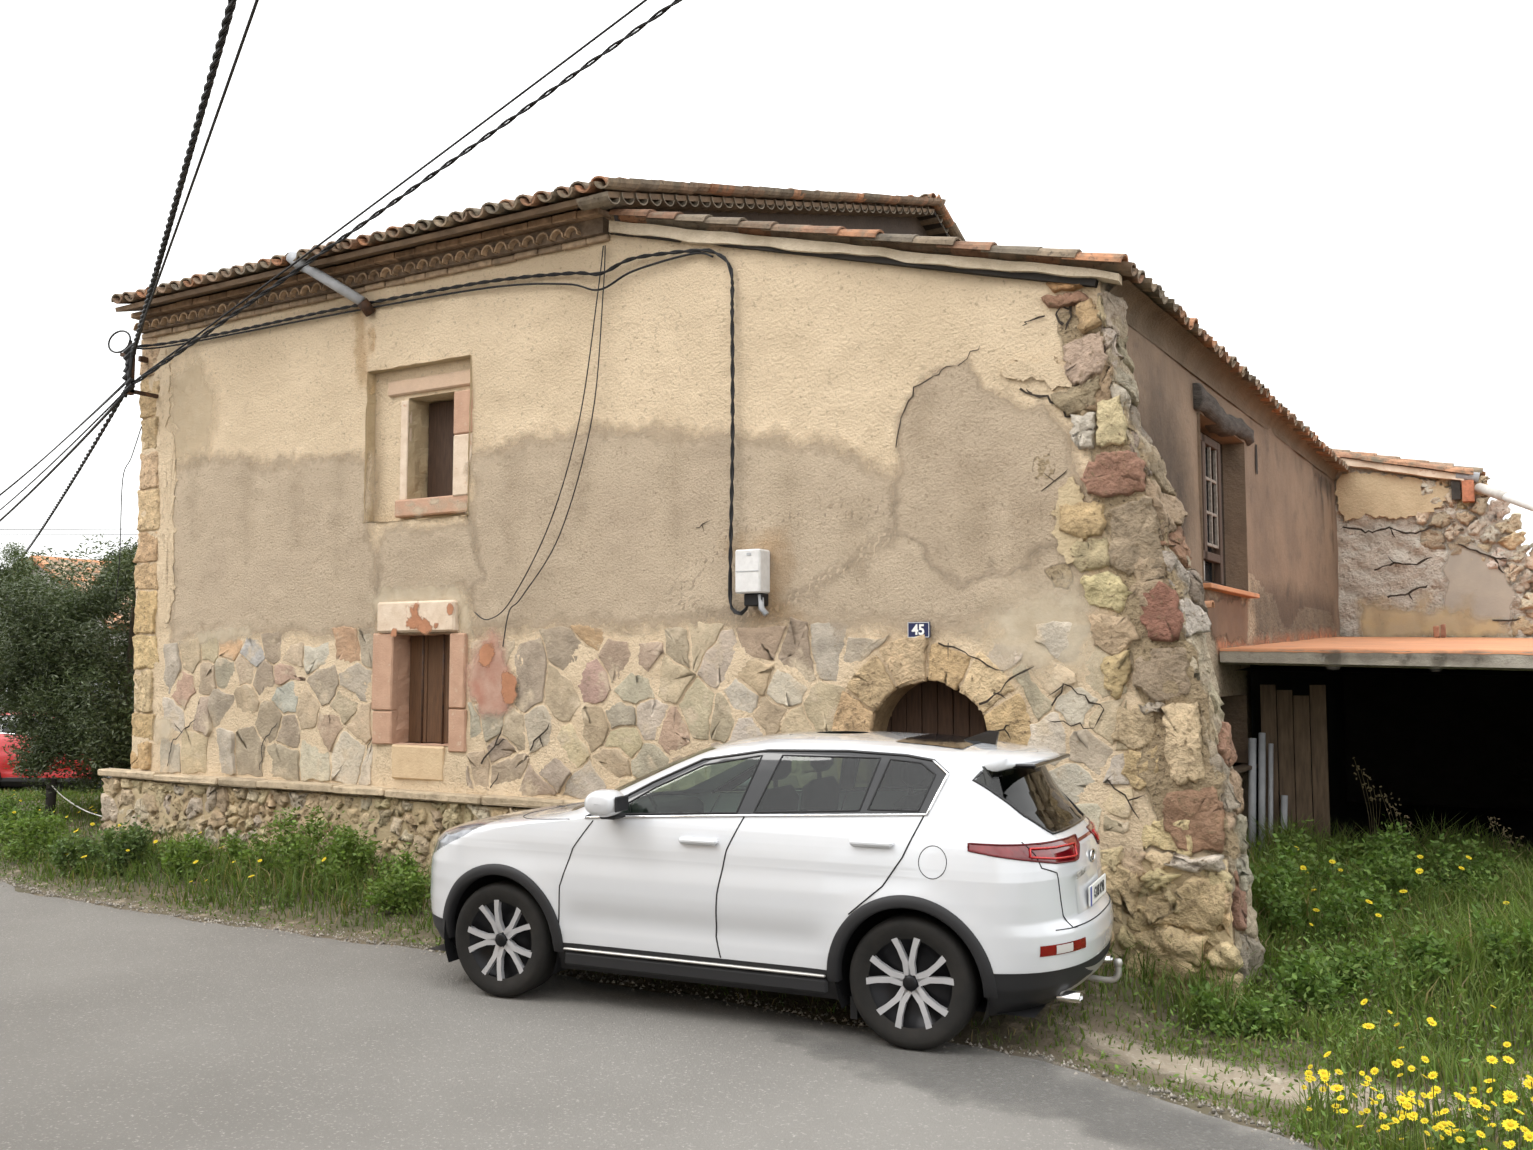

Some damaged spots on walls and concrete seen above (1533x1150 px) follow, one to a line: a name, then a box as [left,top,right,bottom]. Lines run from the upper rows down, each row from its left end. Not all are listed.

crack [895,346,980,448]
crack [1019,388,1071,418]
spalling [1000,312,1104,391]
spalling [1033,359,1153,589]
peeling [1334,471,1449,522]
spalling [1110,565,1226,821]